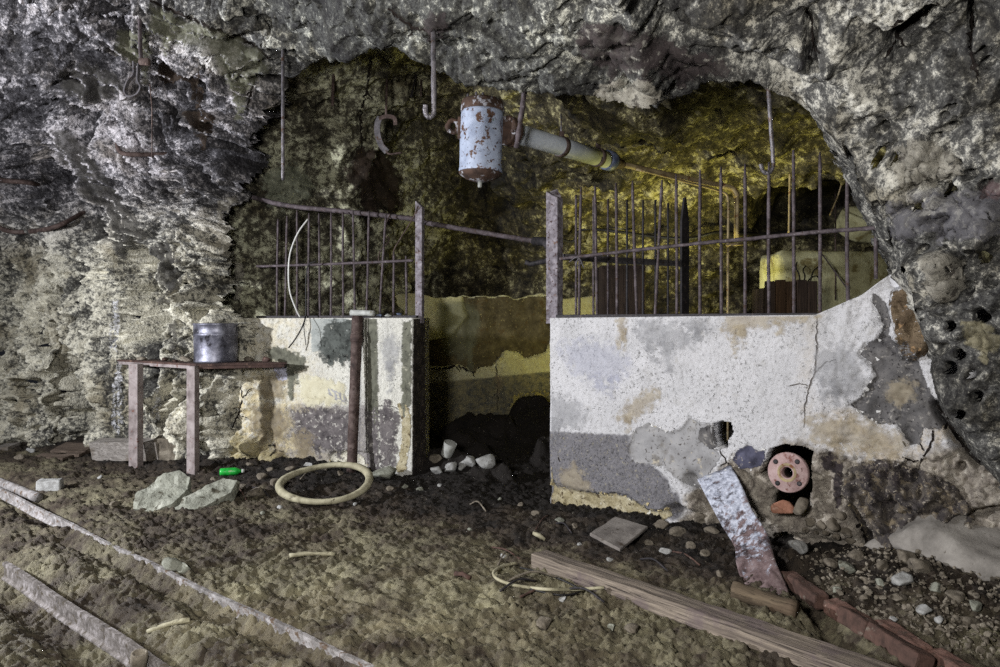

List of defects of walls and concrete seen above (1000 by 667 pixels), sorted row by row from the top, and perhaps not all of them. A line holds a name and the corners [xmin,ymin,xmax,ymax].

leakage [265,318,352,460]
peeling [429,296,550,372]
crack [790,316,836,427]
peeling [851,293,947,445]
flaking render [396,403,412,473]
flaking render [550,467,672,520]
peeling [628,418,766,489]
flaking render [841,459,975,551]